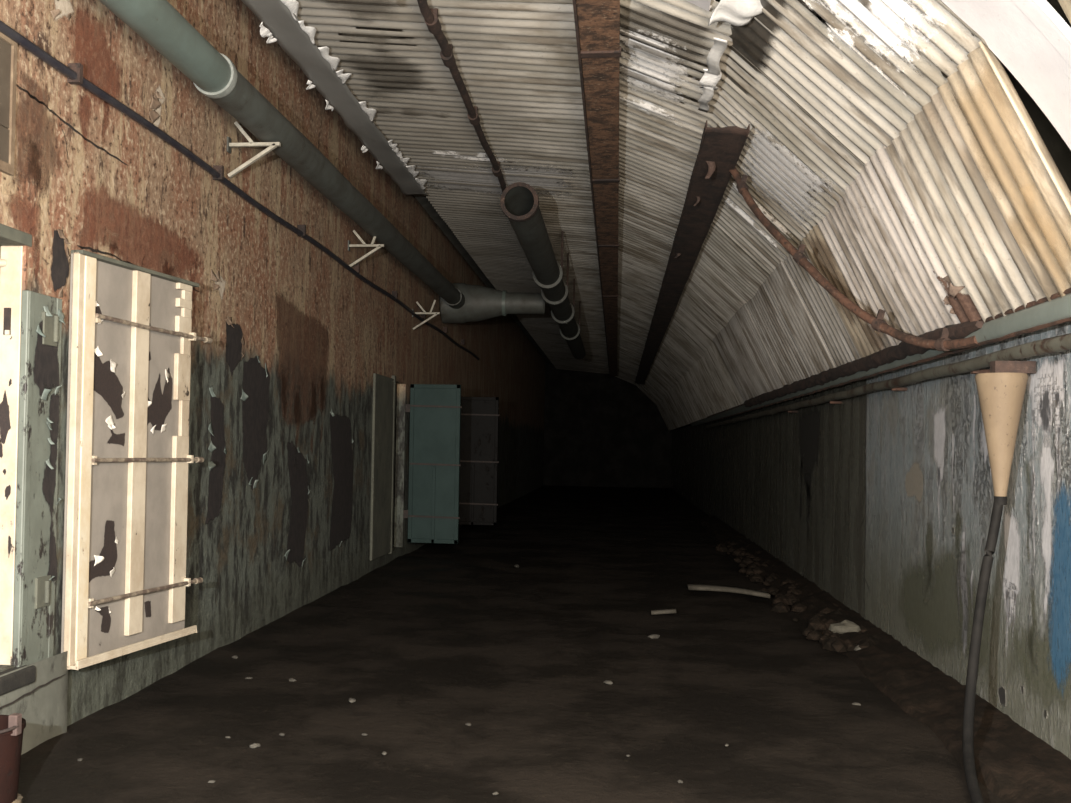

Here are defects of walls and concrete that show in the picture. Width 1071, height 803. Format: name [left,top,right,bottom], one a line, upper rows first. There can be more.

corrosion [810,240,884,349]
peeling [0,379,12,500]
peeling [33,229,70,585]
peeling [93,346,125,446]
peeling [147,368,173,434]
peeling [89,520,119,582]
peeling [95,606,111,633]